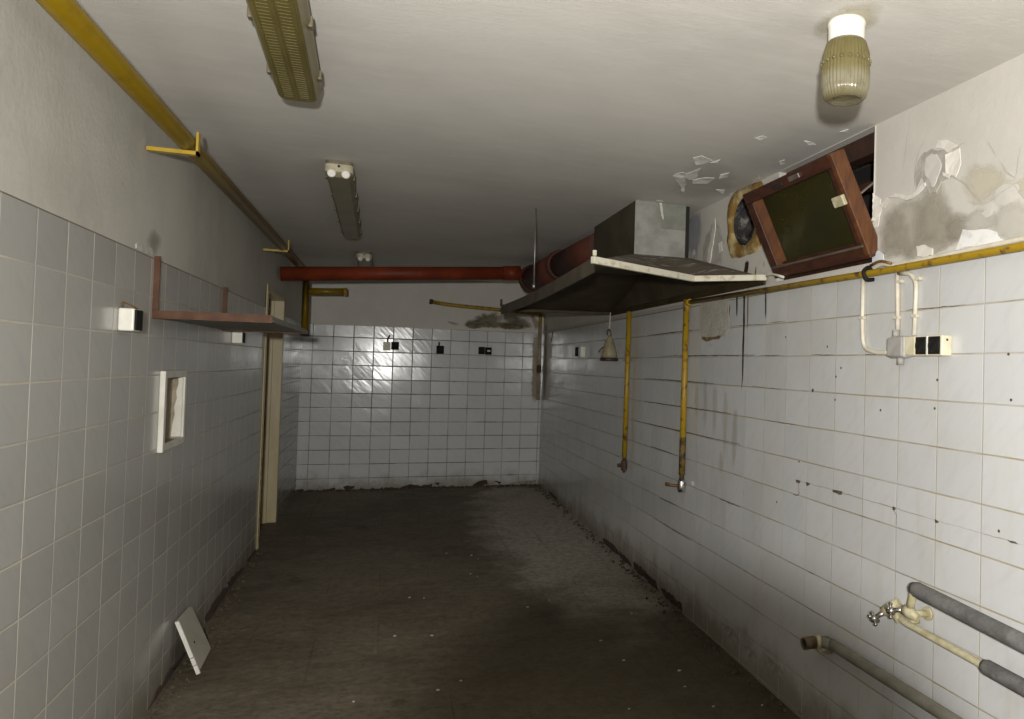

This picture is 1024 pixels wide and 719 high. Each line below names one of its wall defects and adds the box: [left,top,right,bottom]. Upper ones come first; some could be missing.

peeling [673,155,736,196]
flaking render [871,140,961,229]
damp [884,187,1024,258]
damp [466,314,553,398]